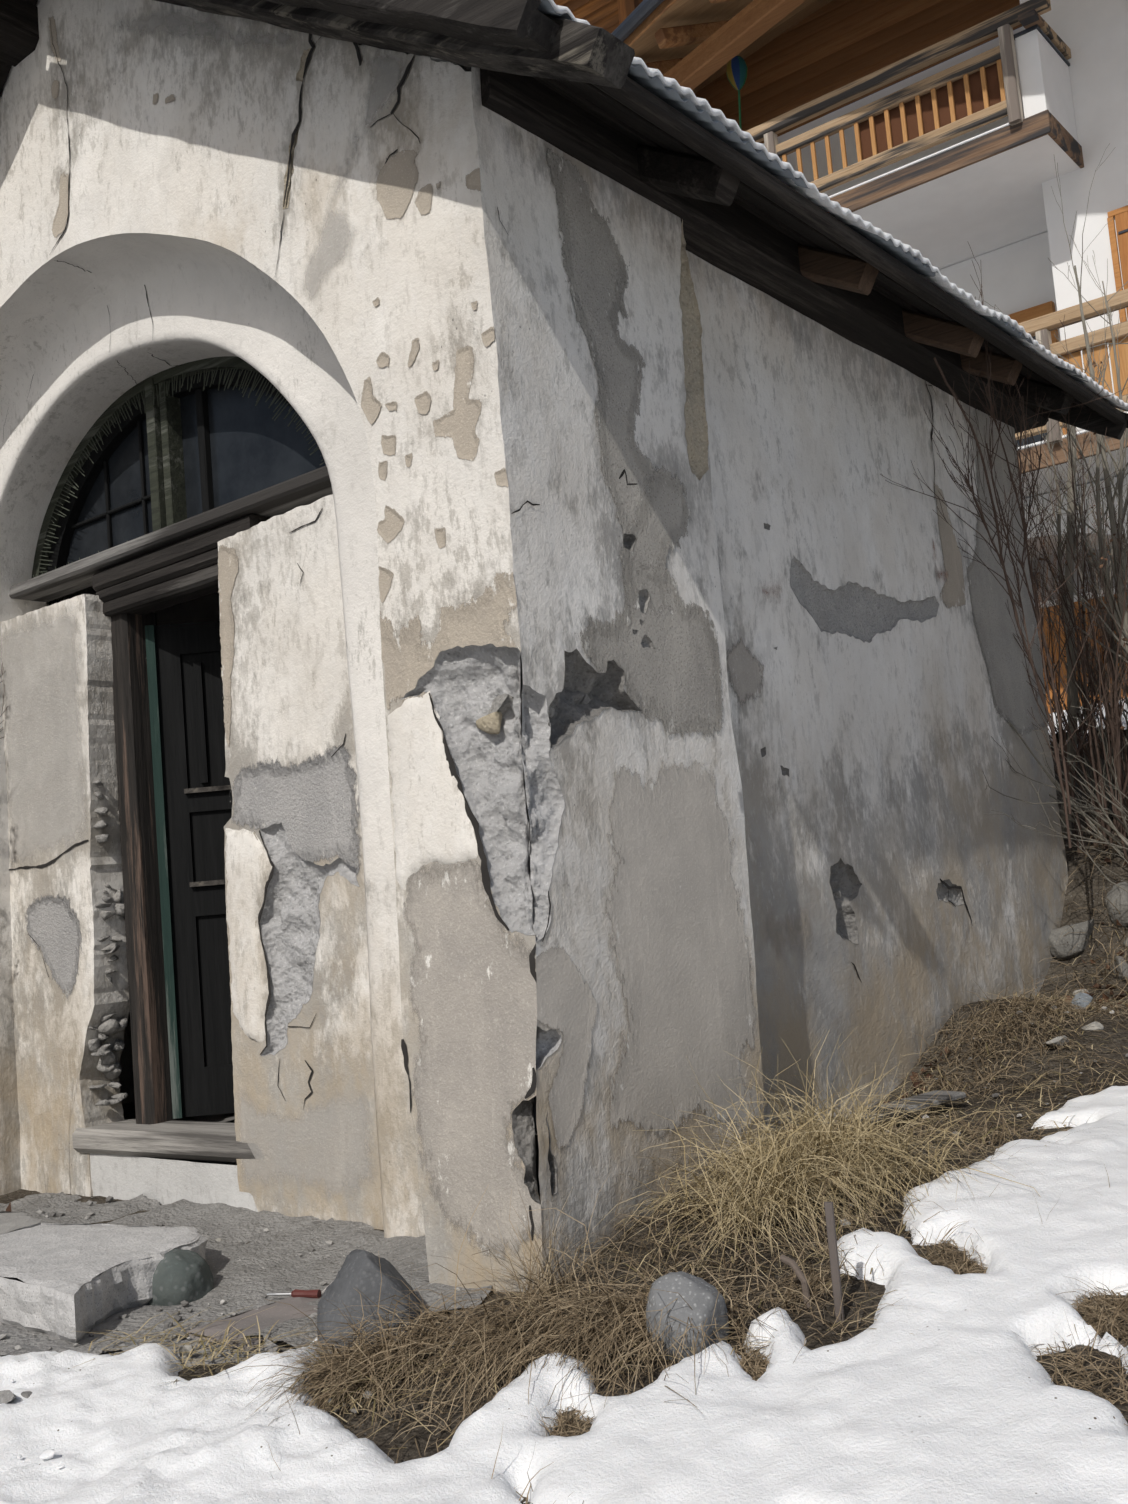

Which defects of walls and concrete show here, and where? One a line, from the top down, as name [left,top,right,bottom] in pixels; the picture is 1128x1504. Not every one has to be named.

crack [275,34,362,275]
crack [371,56,420,164]
peeling [218,545,238,746]
peeling [361,148,764,1258]
peeling [790,409,1047,736]
peeling [25,894,82,996]
peeling [231,745,361,1056]
crack [429,693,551,981]
spalling [829,858,862,944]
spalling [936,879,964,906]
crack [524,1067,536,1099]
crack [527,1205,535,1240]